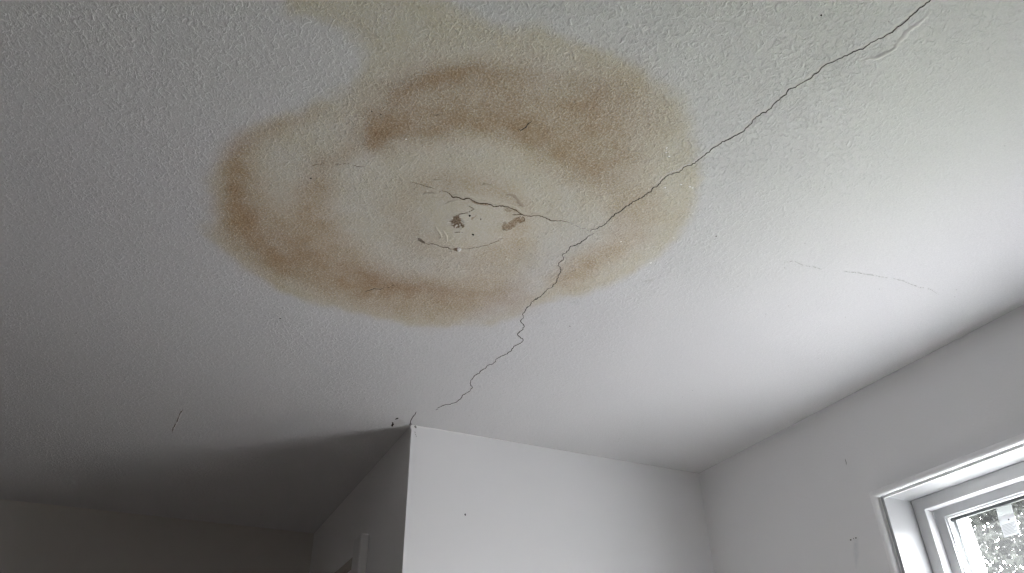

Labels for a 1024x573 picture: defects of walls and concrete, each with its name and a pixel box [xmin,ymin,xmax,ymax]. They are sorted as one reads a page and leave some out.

leakage [175,0,718,341]
crack [410,0,932,423]